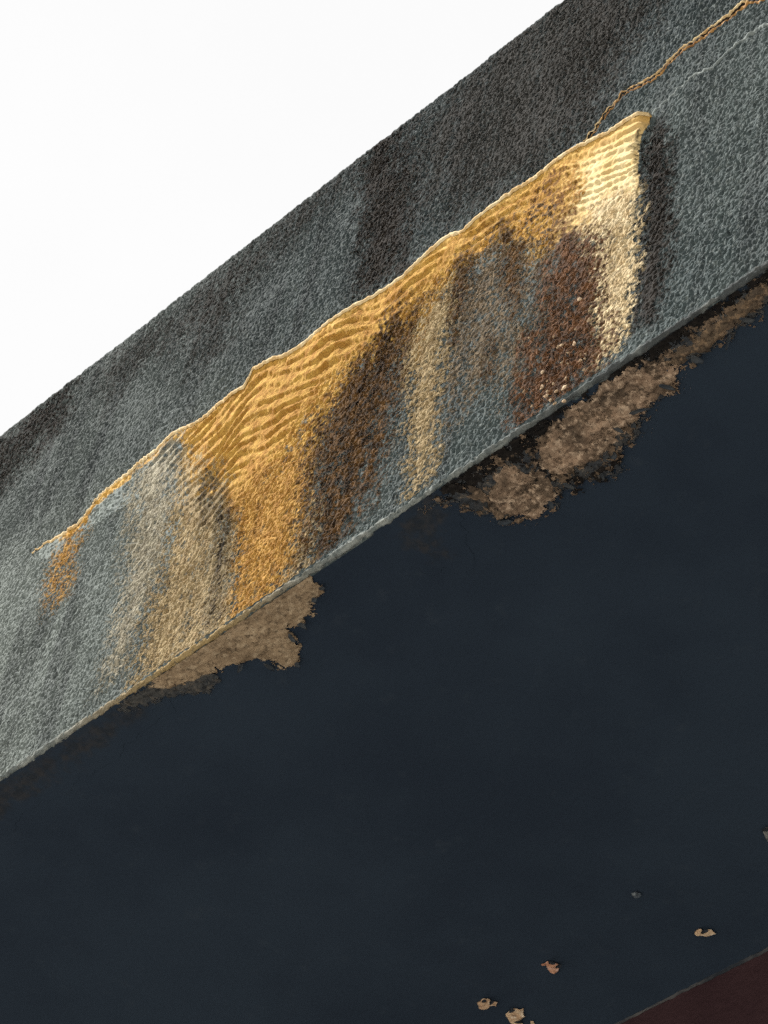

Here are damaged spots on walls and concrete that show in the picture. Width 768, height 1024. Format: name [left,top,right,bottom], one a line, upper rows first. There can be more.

crack [571,0,768,148]
corrosion [124,148,620,690]
peeling [418,277,768,526]
peeling [117,576,325,713]
peeling [477,998,498,1010]
peeling [506,1008,534,1024]
peeling [541,961,562,974]